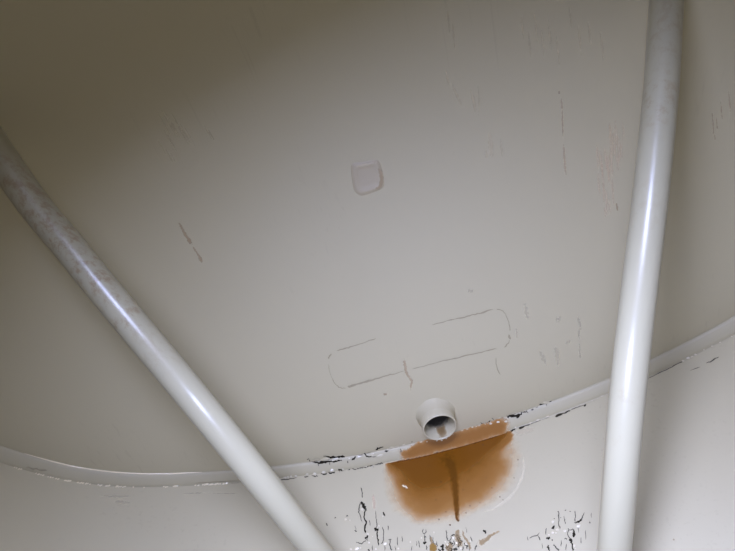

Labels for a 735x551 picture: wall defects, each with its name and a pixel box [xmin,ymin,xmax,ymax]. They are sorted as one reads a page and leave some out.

rust [385,418,519,526]
peeling [345,488,499,551]
peeling [527,510,592,551]